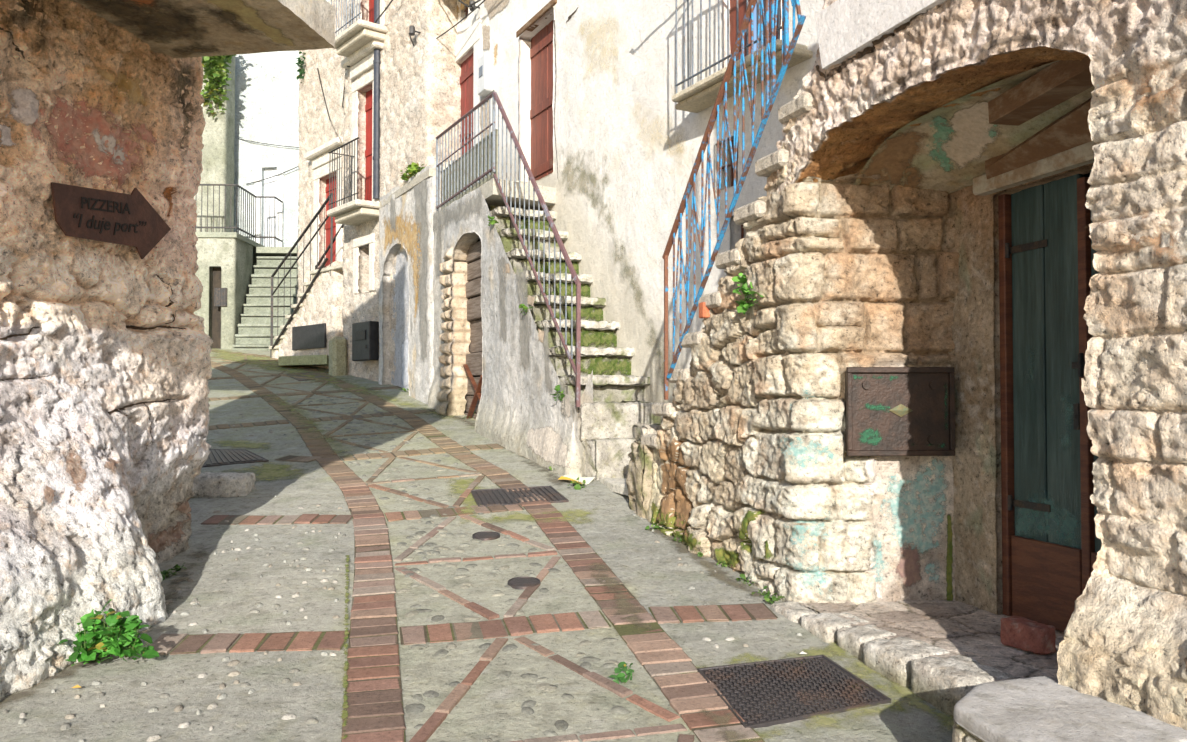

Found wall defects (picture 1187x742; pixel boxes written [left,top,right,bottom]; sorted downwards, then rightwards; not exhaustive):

damp [10,0,47,50]
damp [207,0,293,46]
damp [81,0,220,161]
peeling [929,102,998,172]
damp [563,158,611,228]
damp [620,246,642,307]
peeling [860,429,882,445]
peeling [848,443,950,599]